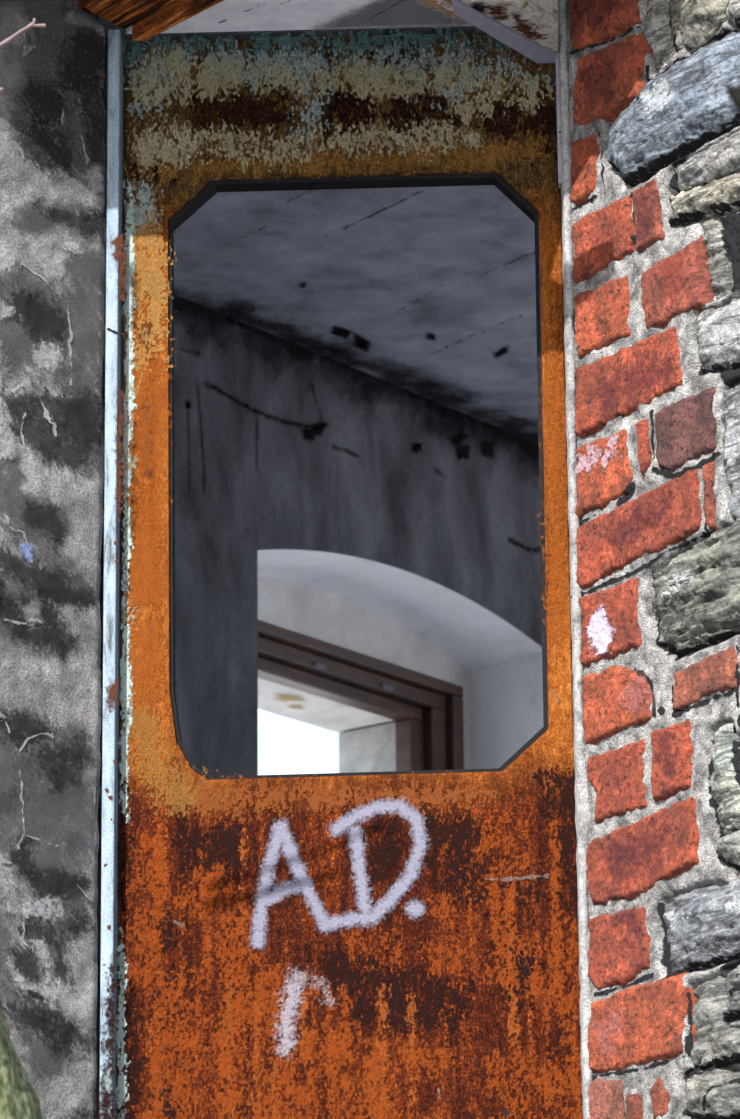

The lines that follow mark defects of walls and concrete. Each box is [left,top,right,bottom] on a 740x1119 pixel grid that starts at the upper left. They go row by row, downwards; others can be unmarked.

rust [111,234,128,300]
peeling [105,20,556,824]
rust [541,360,570,644]
rust [94,621,583,1119]